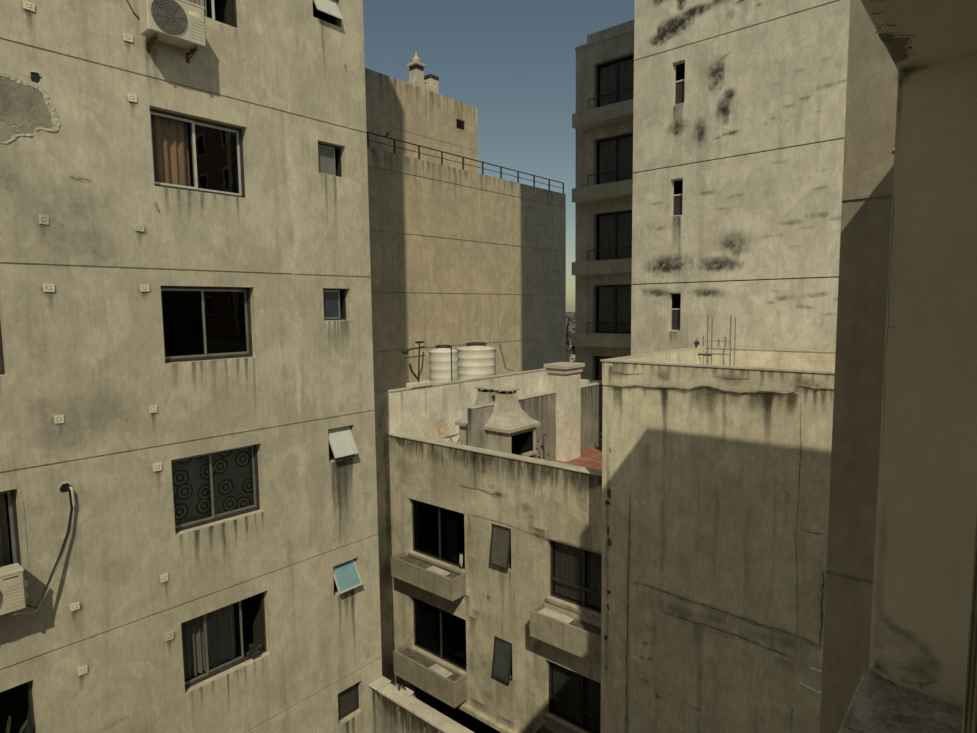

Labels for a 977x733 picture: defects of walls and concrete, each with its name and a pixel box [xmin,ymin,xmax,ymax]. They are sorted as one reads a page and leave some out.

peeling [865,1,916,64]
flaking render [0,70,61,144]
damp [752,388,832,408]
damp [332,458,352,498]
damp [455,448,602,485]
crack [462,486,601,553]
crack [624,435,824,733]